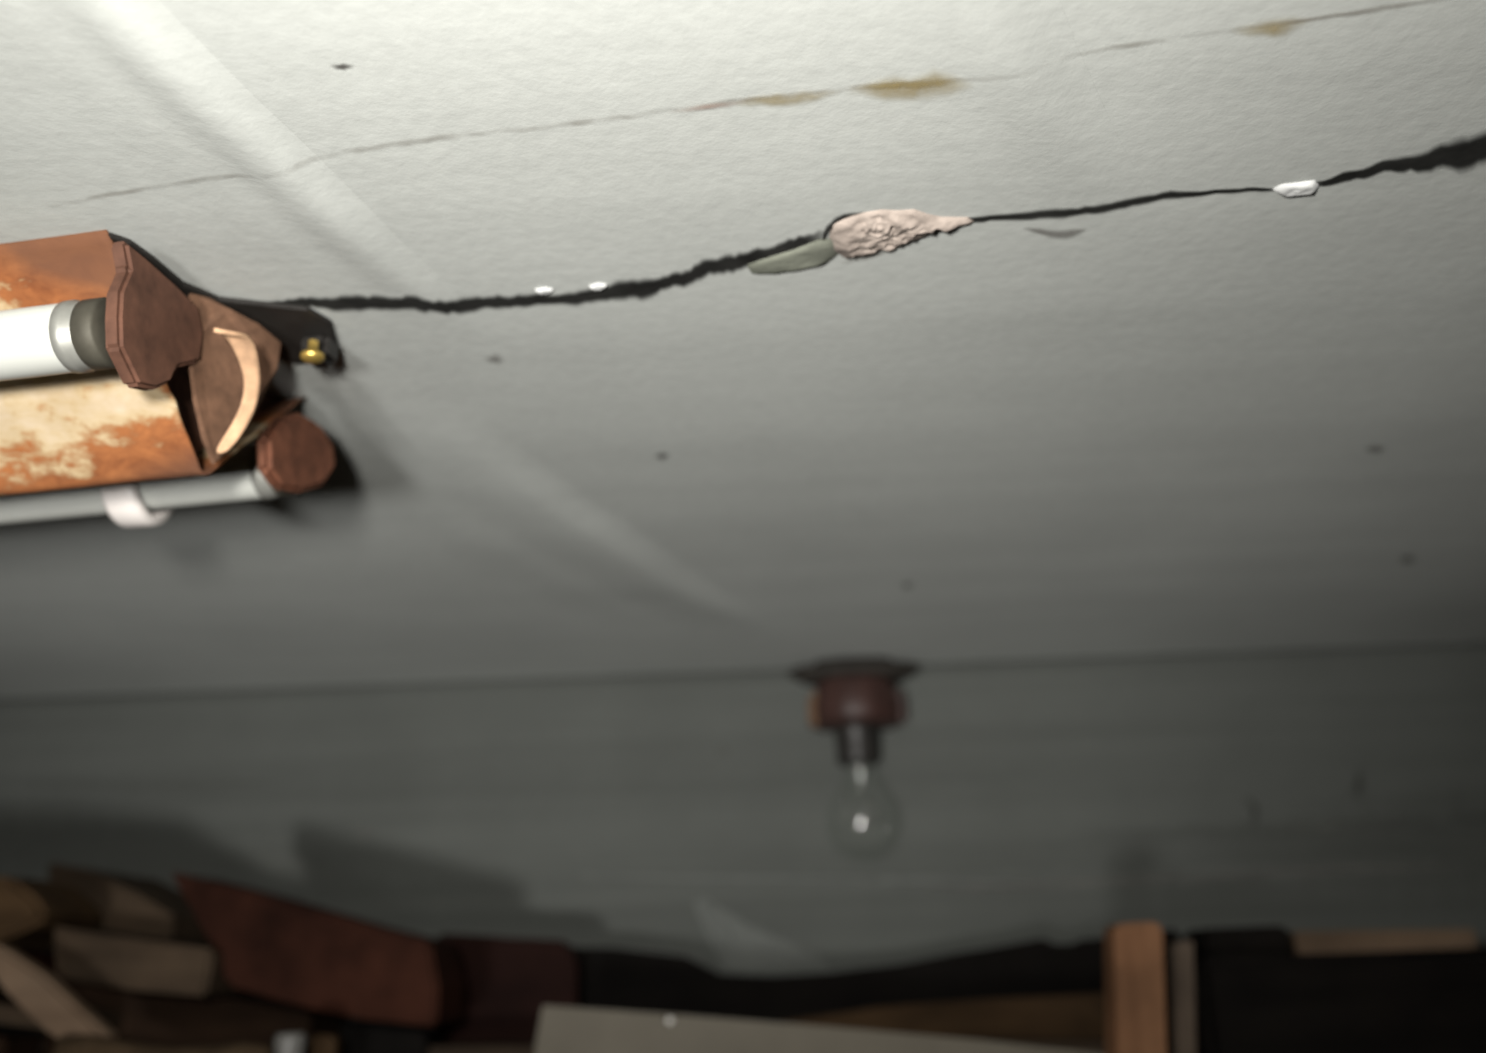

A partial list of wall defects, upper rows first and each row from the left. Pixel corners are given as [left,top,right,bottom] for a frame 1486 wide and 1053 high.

crack [968,134,1486,236]
crack [271,235,838,314]